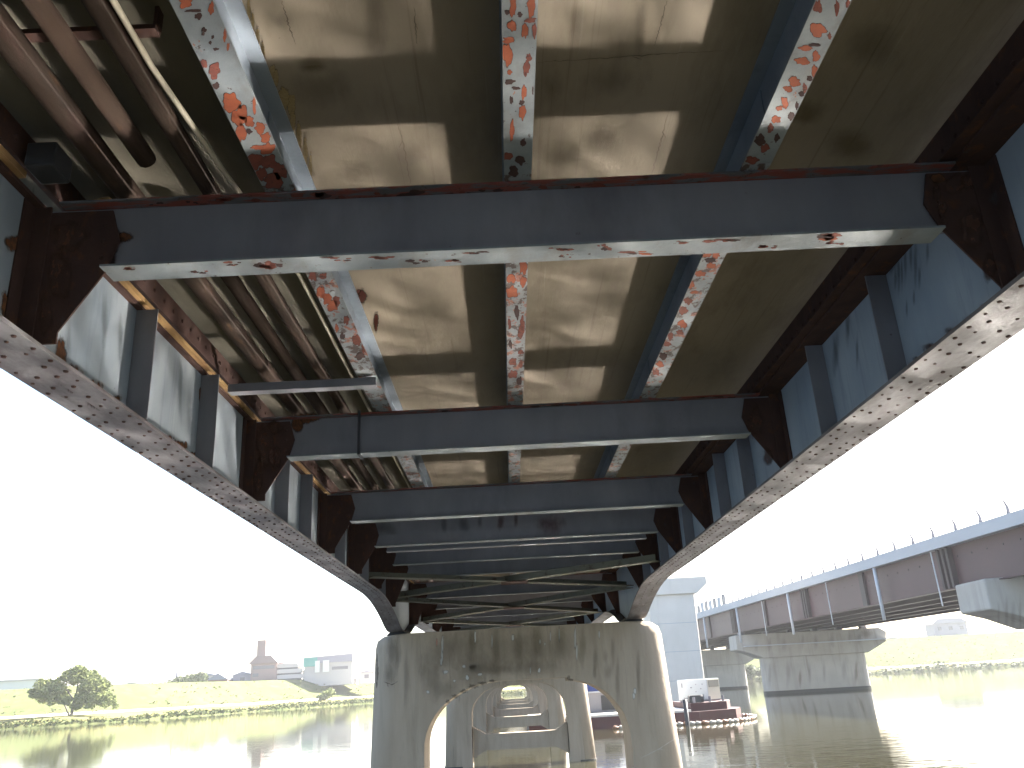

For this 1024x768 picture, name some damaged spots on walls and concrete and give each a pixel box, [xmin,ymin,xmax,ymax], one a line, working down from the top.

peeling [179,0,287,189]
peeling [247,0,312,175]
peeling [503,0,537,177]
peeling [745,0,850,165]
rust [5,236,18,251]
peeling [308,272,366,360]
peeling [506,262,528,385]
peeling [652,253,720,375]